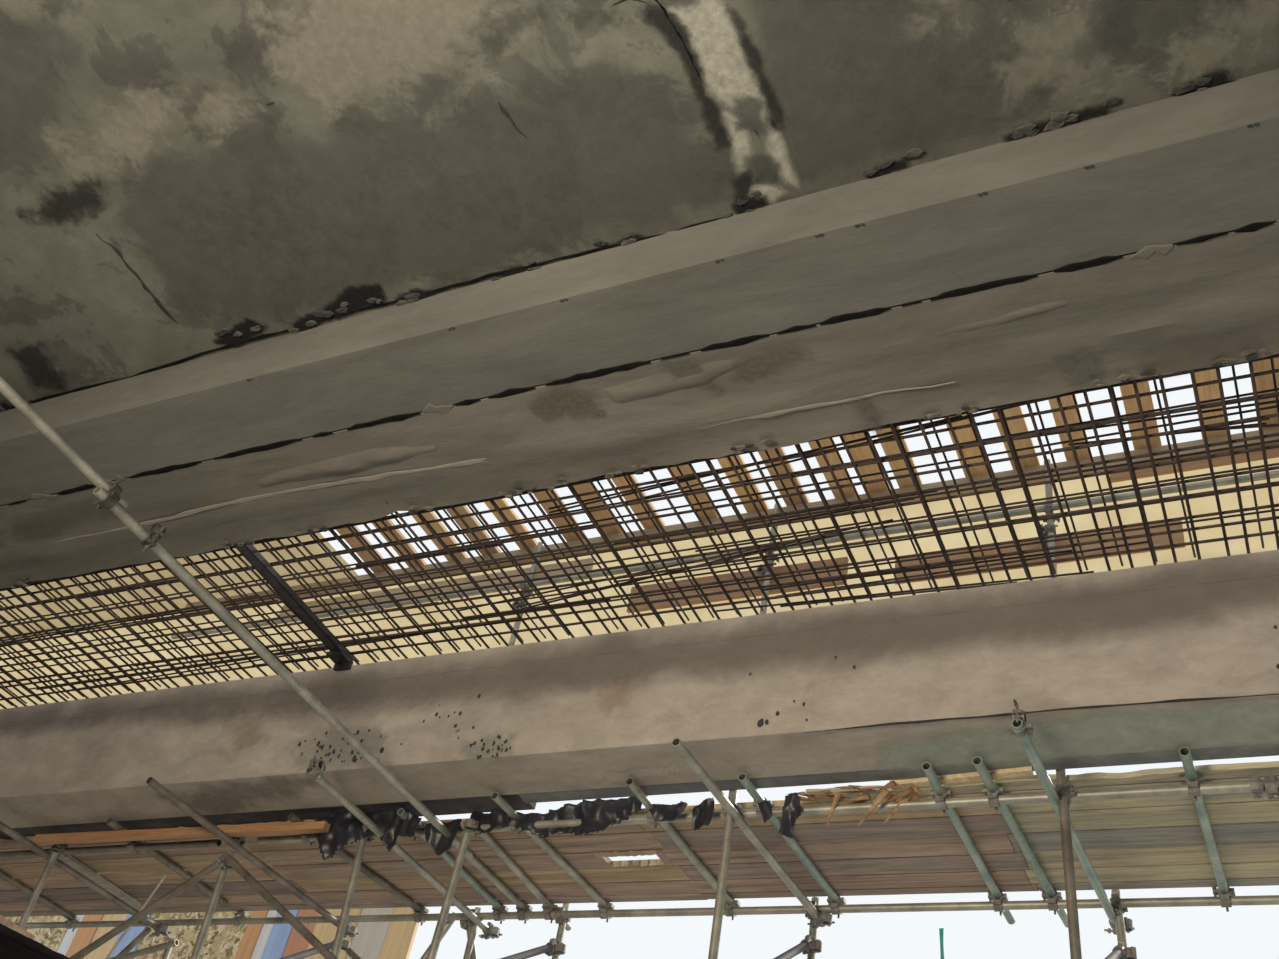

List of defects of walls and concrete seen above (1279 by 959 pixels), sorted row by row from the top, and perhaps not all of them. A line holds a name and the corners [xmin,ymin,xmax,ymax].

spalling [1004,97,1122,142]
leakage [124,0,1034,316]
spalling [287,284,434,334]
spalling [213,318,264,347]
crack [9,217,1279,505]
spalling [0,399,31,412]
spalling [729,438,775,454]
spalling [605,465,647,478]
spalling [499,478,568,499]
spalling [401,505,435,516]
spalling [294,524,329,535]
spalling [423,705,511,759]